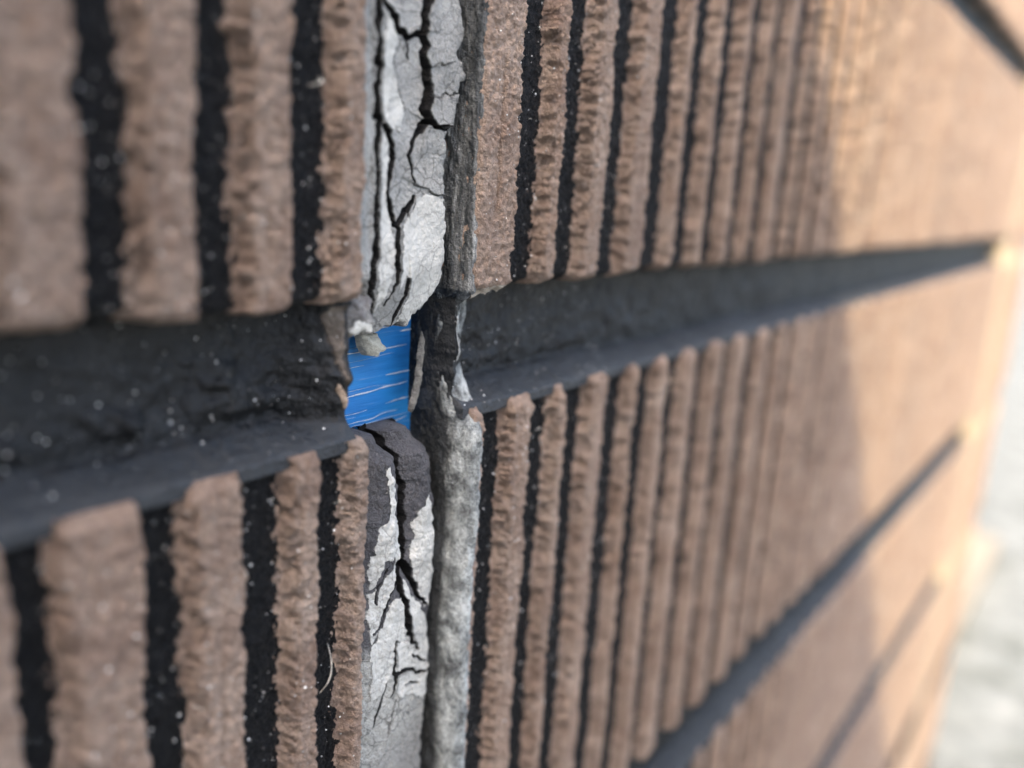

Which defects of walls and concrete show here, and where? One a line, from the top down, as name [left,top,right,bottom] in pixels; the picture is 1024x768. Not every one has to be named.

crack [398,90,450,131]
peeling [349,321,373,335]